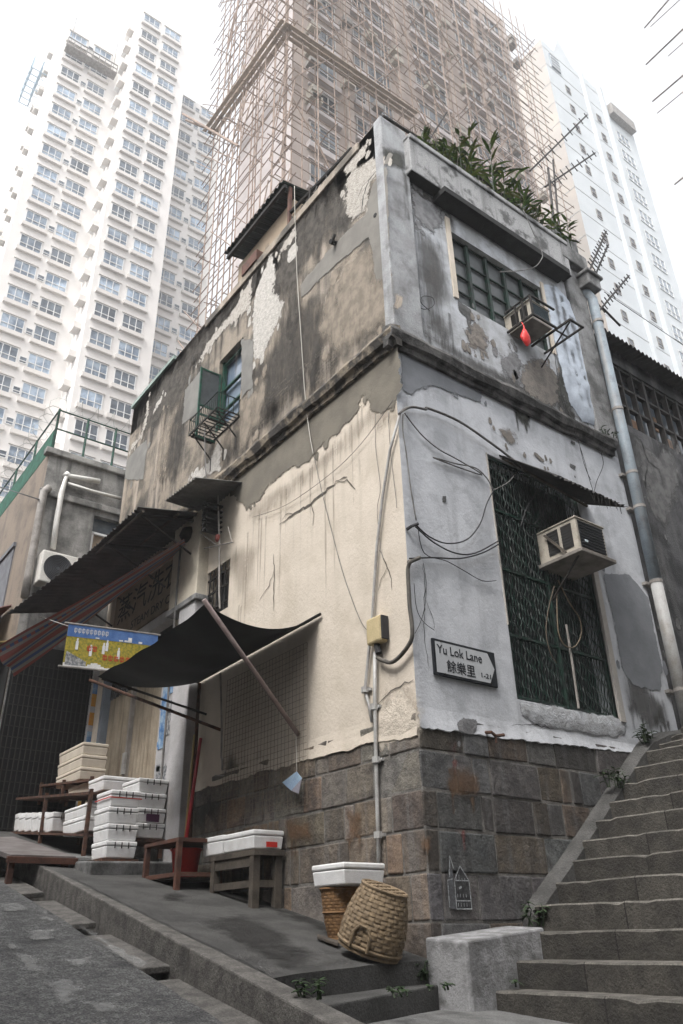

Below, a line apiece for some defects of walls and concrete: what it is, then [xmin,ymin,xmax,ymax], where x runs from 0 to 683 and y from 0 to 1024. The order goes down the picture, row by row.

flaking render [340,139,392,222]
water stain [137,185,351,485]
flaking render [196,227,298,450]
flaking render [458,301,564,413]
crack [280,477,355,524]